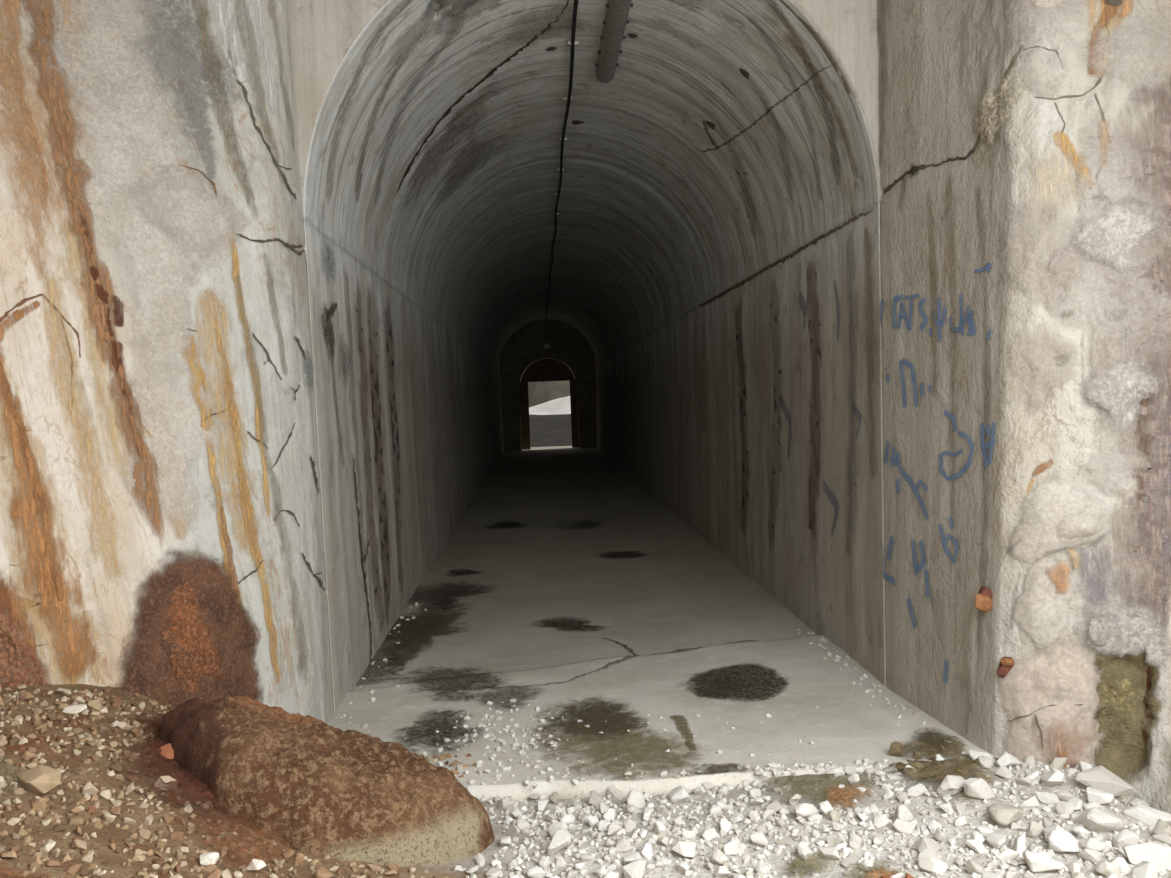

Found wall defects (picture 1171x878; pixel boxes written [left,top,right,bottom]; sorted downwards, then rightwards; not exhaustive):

spalling [972,46,1063,159]
crack [1035,24,1111,203]
crack [0,293,81,401]
rust [0,0,185,576]
peeling [1050,123,1171,492]
rust [0,353,96,685]
rust [184,229,279,677]
leakage [356,616,440,685]
leakage [397,710,482,755]
crack [458,638,757,688]
leakage [688,664,788,701]
spalling [1091,651,1161,783]